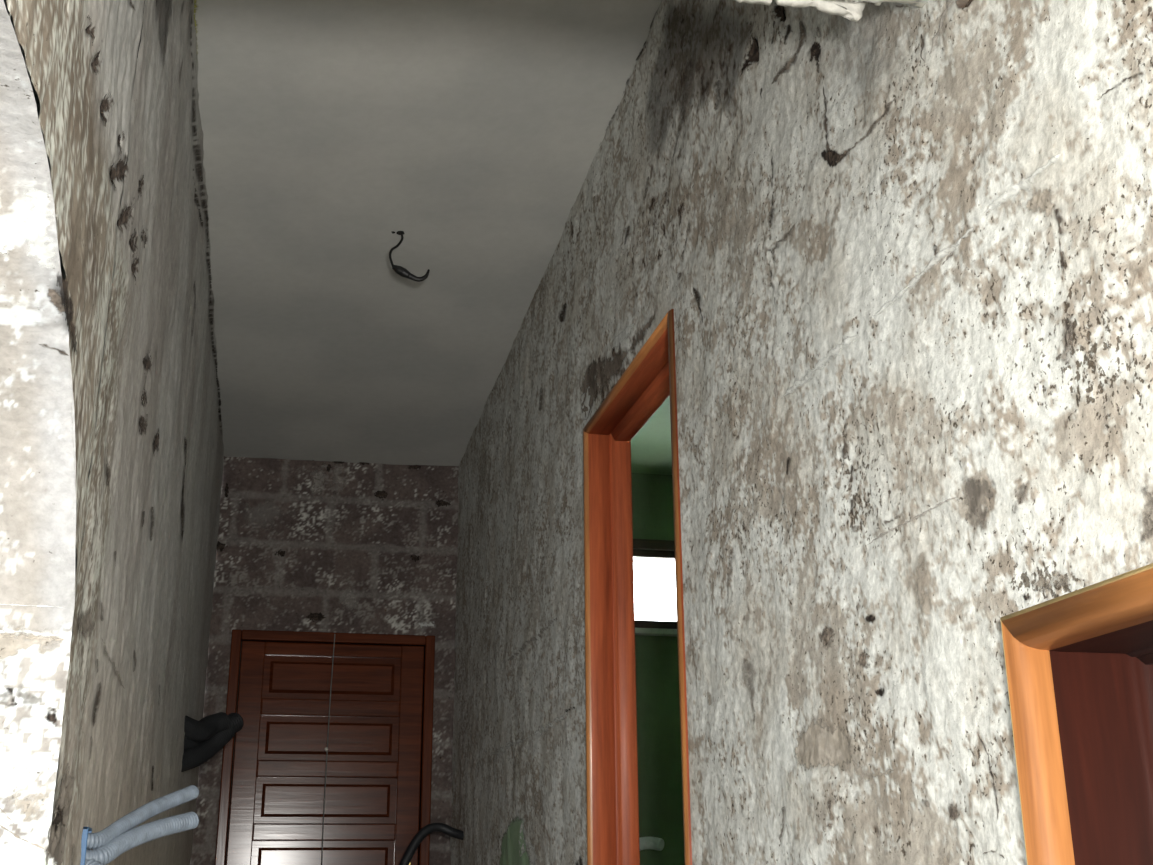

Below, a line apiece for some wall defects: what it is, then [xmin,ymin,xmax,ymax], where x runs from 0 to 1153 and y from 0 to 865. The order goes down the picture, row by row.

spalling [0,627,65,659]
spalling [0,688,57,724]
spalling [46,764,75,865]
peeling [500,817,535,865]